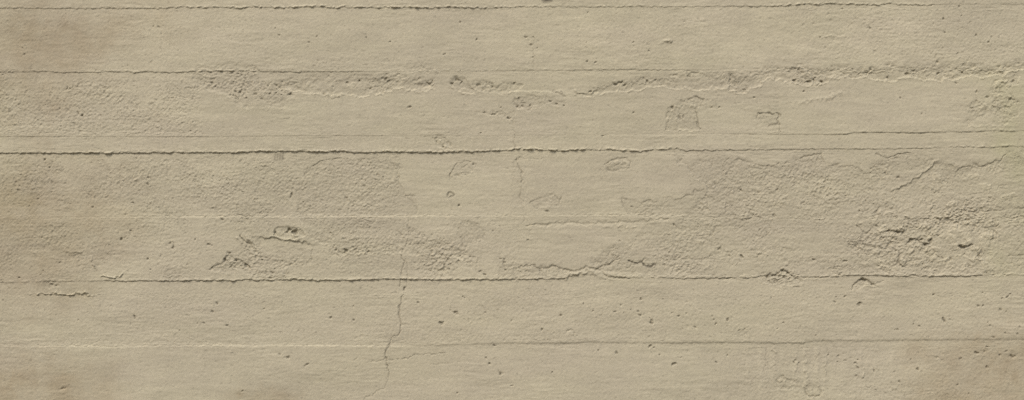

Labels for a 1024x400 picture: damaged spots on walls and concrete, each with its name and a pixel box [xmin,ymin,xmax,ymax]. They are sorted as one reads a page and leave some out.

crack [363,164,464,400]